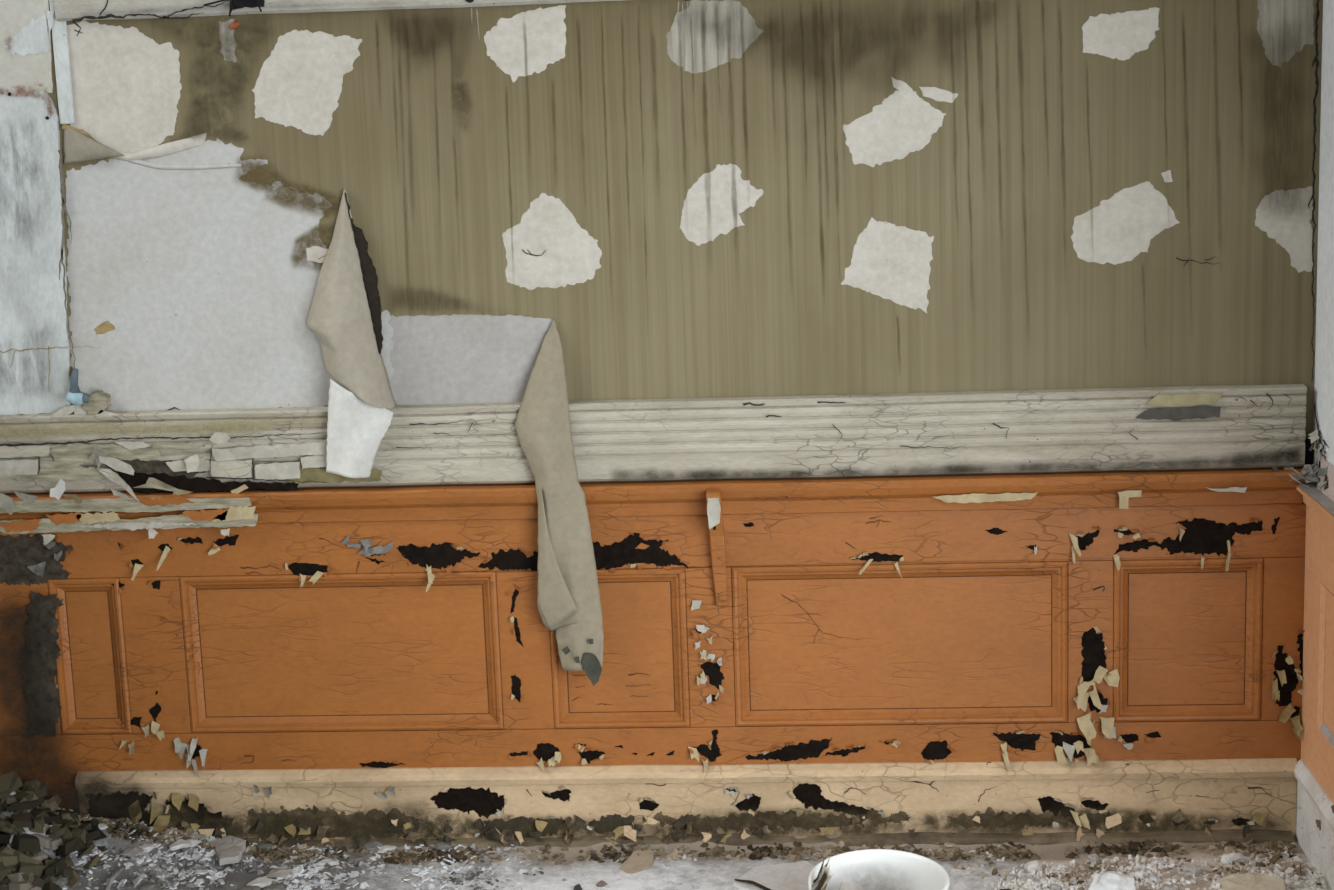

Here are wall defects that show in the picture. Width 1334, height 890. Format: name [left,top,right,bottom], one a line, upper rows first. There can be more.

peeling [484,5,567,83]
peeling [843,77,958,167]
peeling [3,11,362,412]
peeling [502,193,602,290]
peeling [680,163,763,246]
peeling [841,217,934,313]
peeling [1071,170,1180,265]
peeling [0,432,382,737]
peeling [592,532,688,574]
peeling [1069,516,1280,572]
peeling [993,626,1161,774]
peeling [94,783,915,849]